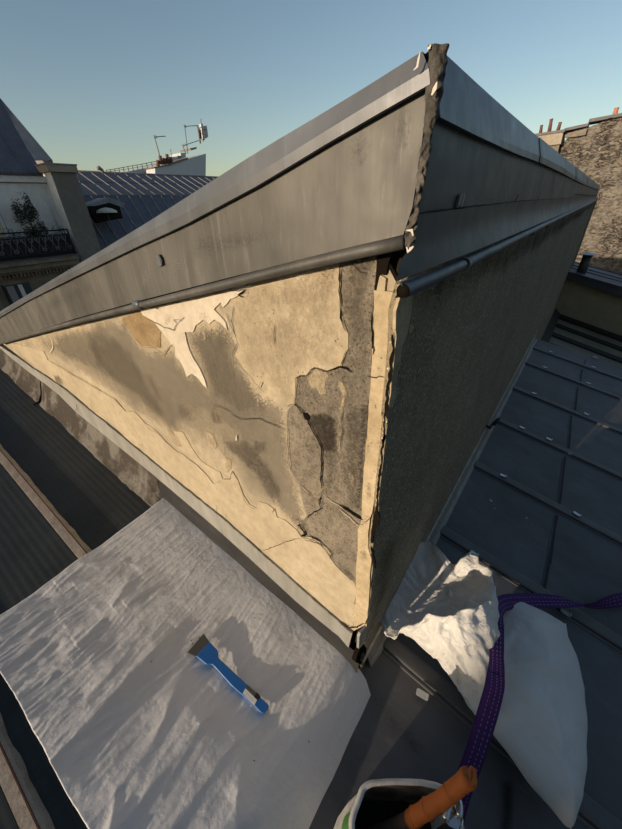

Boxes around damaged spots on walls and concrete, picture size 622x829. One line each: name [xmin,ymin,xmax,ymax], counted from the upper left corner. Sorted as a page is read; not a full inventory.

damp [56,322,304,529]
flaking render [12,255,377,632]
crack [211,252,398,593]